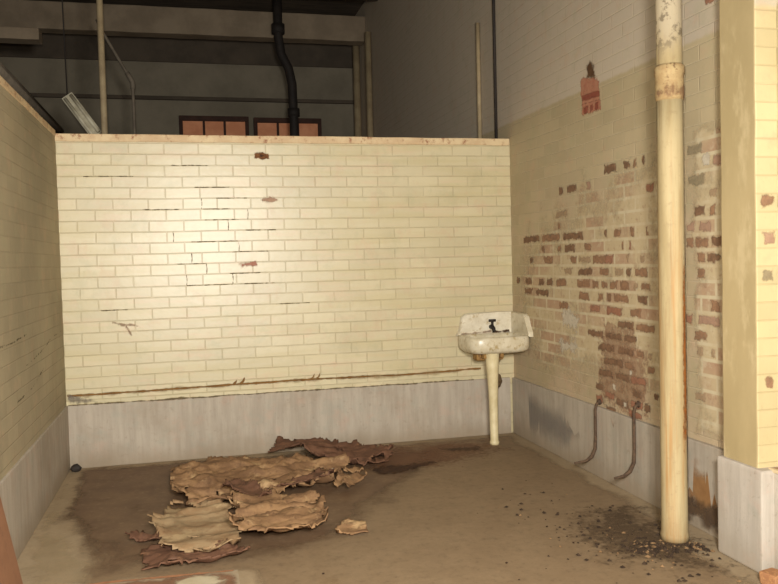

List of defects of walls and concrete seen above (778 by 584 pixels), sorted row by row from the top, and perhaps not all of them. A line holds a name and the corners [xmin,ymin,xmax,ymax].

spalling [761,195,774,206]
peeling [517,156,659,419]
peeling [686,127,723,439]
water stain [66,436,751,584]
rust [688,471,718,529]